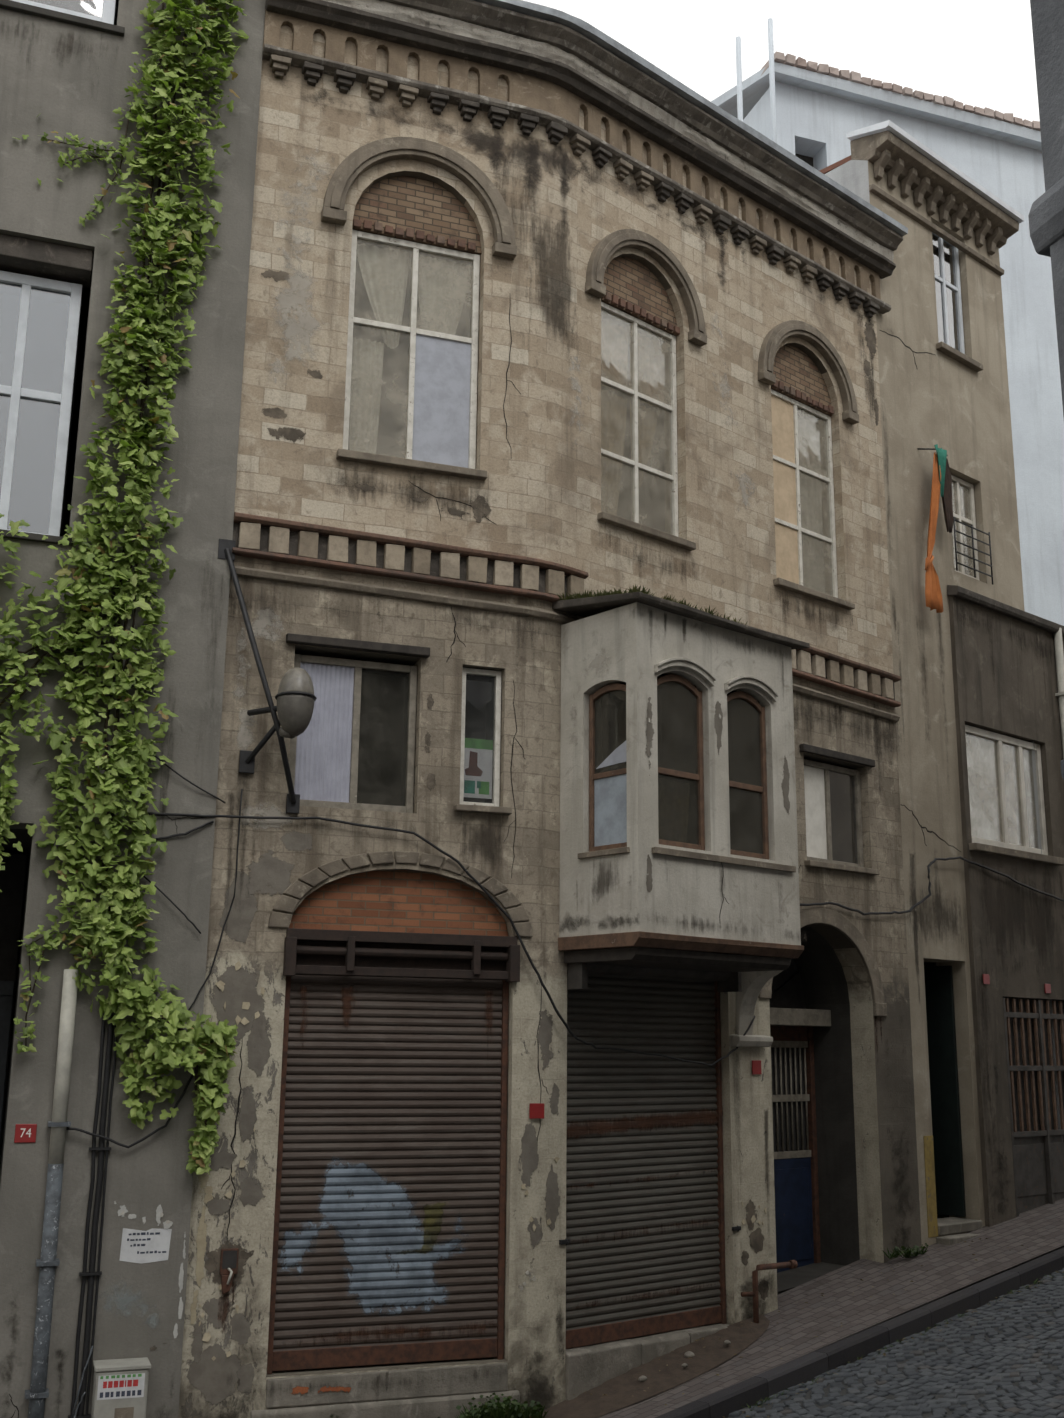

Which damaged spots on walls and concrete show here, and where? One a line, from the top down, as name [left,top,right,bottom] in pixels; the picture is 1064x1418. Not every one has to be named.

leakage [526,142,540,189]
spalling [261,270,290,282]
leakage [274,132,522,382]
leakage [535,147,721,347]
spalling [262,407,306,443]
crack [503,309,521,448]
crack [880,330,935,367]
flaking render [219,830,312,944]
peeling [536,1009,553,1070]
peeling [114,961,272,1405]
peeling [519,1123,560,1249]
flaking render [741,1199,767,1265]